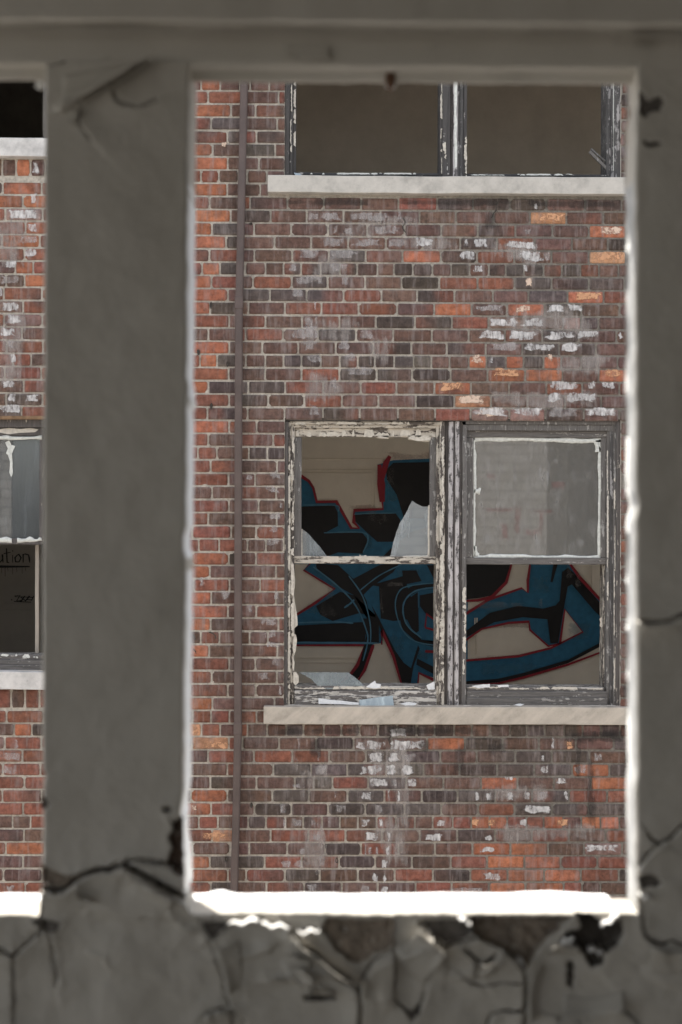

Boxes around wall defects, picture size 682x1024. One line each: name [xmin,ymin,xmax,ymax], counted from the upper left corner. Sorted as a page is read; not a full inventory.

peeling [440,84,485,176]
water stain [507,241,539,271]
water stain [480,304,598,352]
water stain [0,354,38,413]
water stain [475,381,614,416]
peeling [288,421,616,696]
water stain [357,728,424,801]
water stain [510,791,550,842]
crack [41,858,186,899]
crack [641,914,682,946]
crack [292,919,426,1024]
crack [431,933,527,1024]